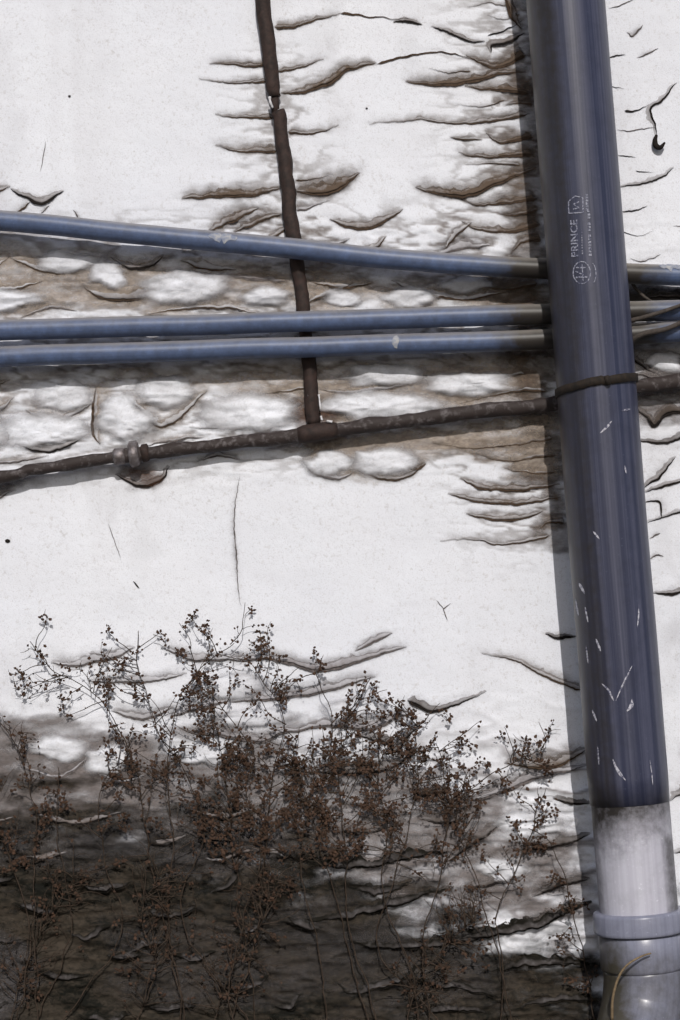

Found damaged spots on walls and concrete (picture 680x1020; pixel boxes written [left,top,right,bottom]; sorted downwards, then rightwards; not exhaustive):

crack [610,25,658,58]
peeling [274,0,541,253]
crack [617,127,655,172]
peeling [182,186,285,236]
crack [622,206,658,262]
peeling [0,388,101,464]
peeling [638,402,680,444]
peeling [435,433,564,545]
peeling [644,456,680,492]
peeling [90,632,486,776]
leakage [0,715,602,1020]
peeling [348,900,592,950]